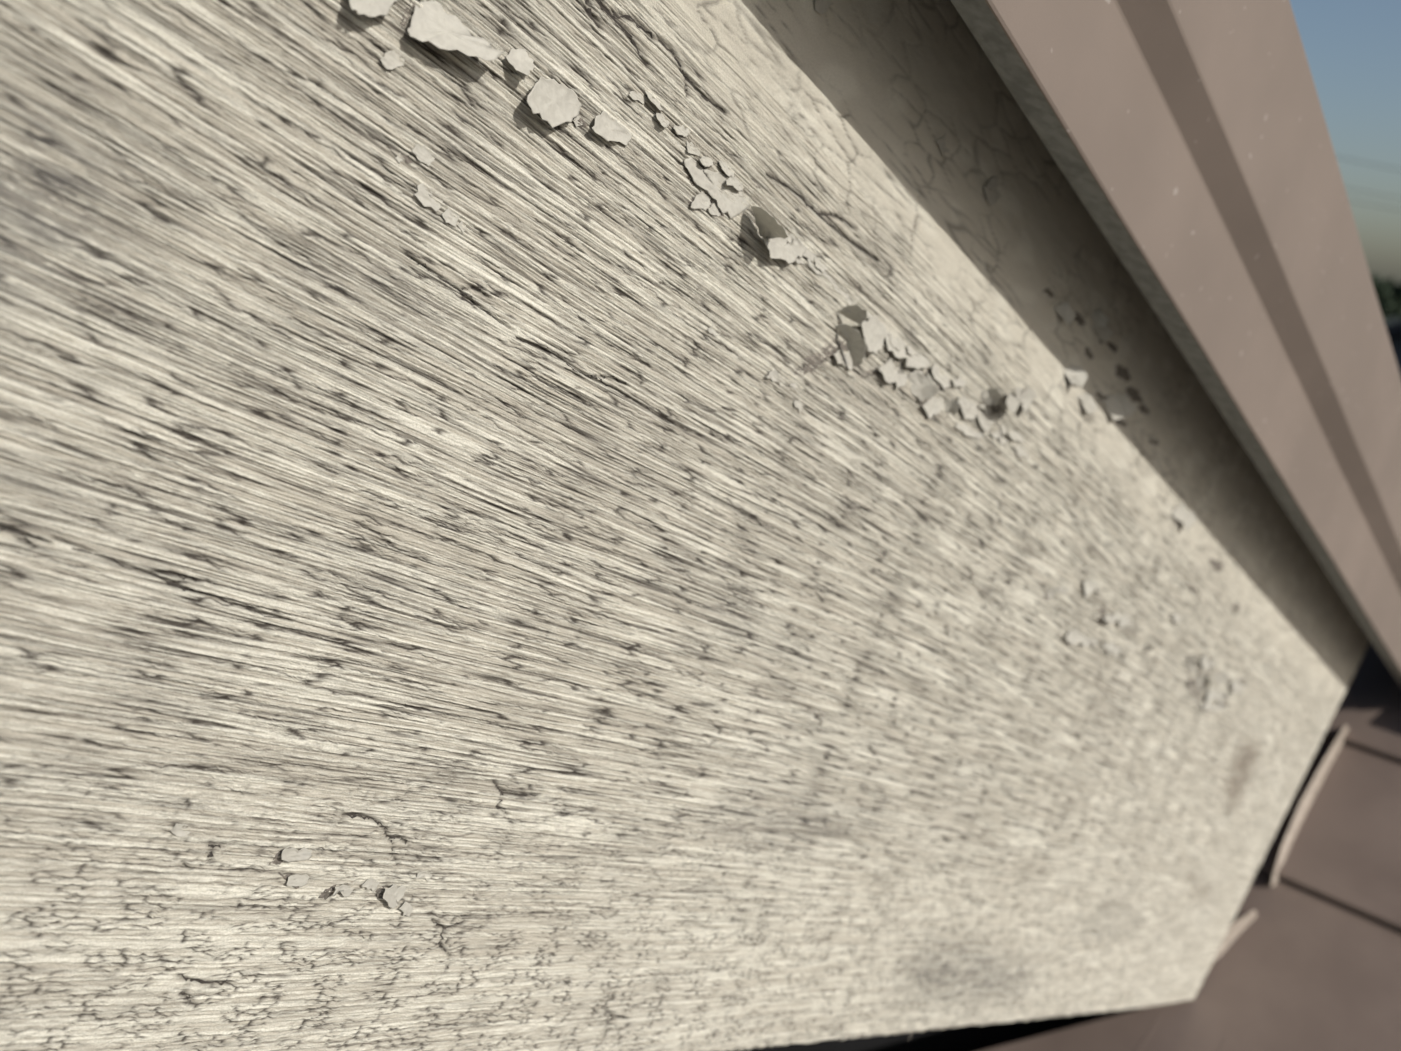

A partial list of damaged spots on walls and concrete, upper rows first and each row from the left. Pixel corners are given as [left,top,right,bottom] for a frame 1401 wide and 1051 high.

peeling [349,0,632,146]
crack [585,0,725,113]
peeling [395,144,435,166]
peeling [413,183,469,234]
crack [767,174,876,260]
peeling [627,91,1036,459]
peeling [1043,287,1150,427]
peeling [1171,502,1197,532]
peeling [1208,558,1223,572]
peeling [1043,578,1132,656]
peeling [269,847,312,889]
peeling [318,871,432,916]